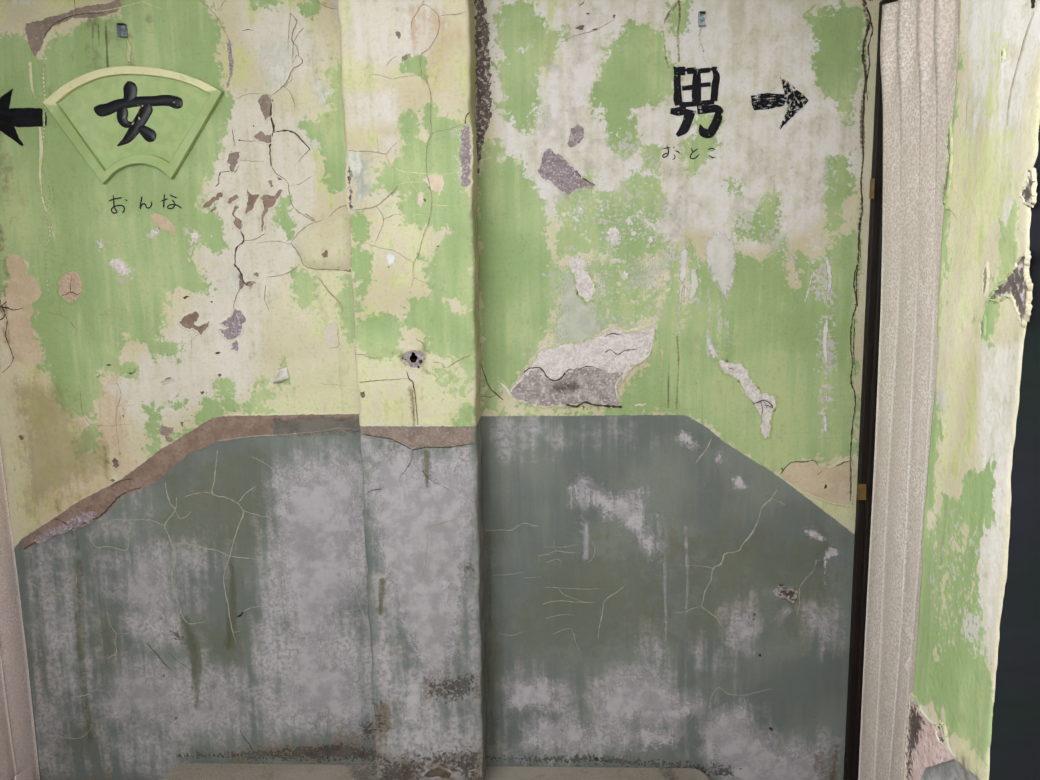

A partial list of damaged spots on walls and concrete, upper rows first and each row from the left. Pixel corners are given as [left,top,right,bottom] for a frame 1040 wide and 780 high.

water stain [28,56,55,302]
flaking render [1020,166,1037,208]
crack [24,0,471,700]
crack [418,327,655,409]
flaking render [508,323,657,411]
crack [673,0,873,630]
flaking render [982,247,1033,328]
water stain [273,416,360,435]
water stain [178,446,820,780]
crack [408,515,623,649]
water stain [804,530,838,567]
peeling [904,693,957,780]